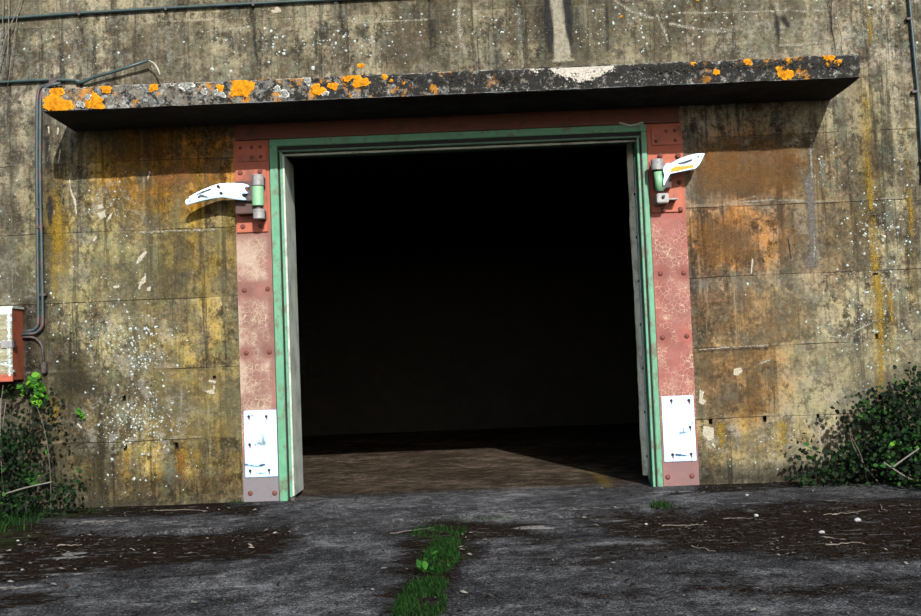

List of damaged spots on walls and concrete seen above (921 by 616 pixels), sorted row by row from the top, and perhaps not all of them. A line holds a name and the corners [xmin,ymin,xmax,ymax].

water stain [44,126,61,167]
water stain [46,197,64,223]